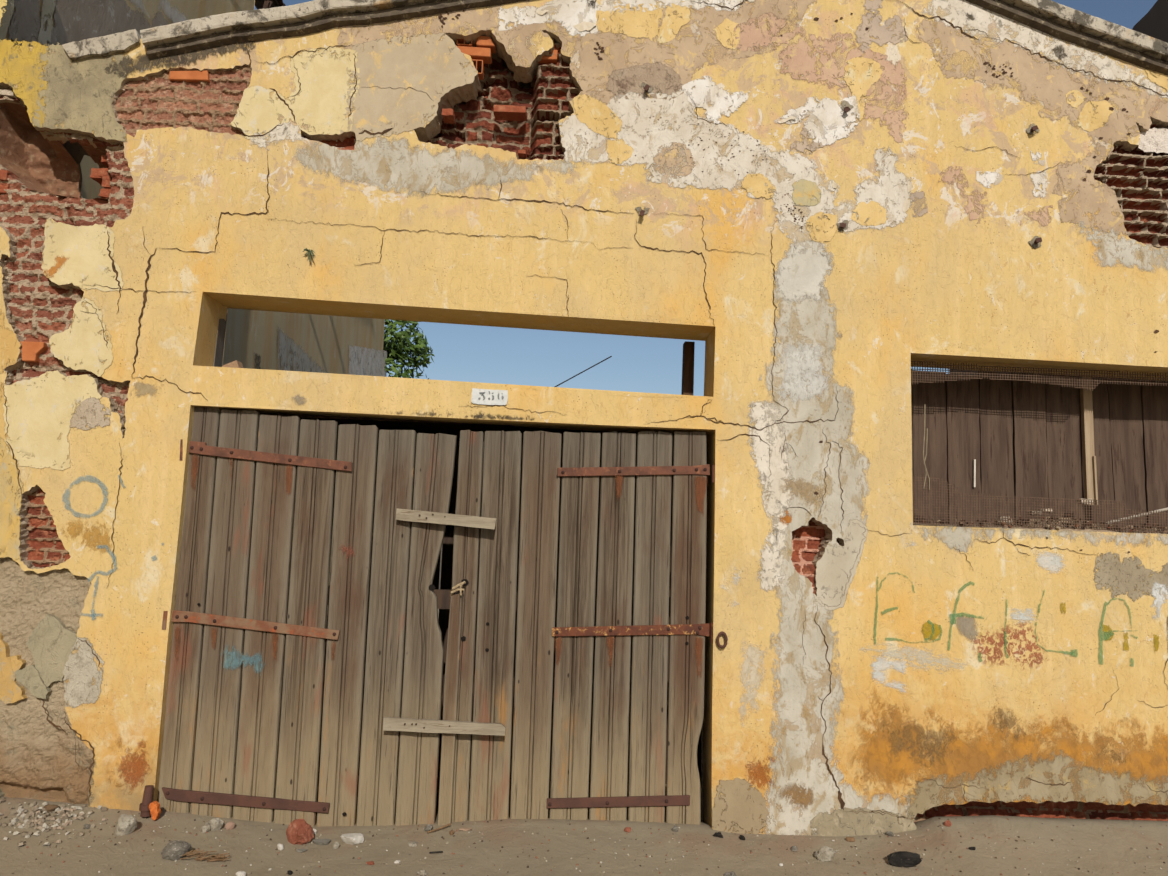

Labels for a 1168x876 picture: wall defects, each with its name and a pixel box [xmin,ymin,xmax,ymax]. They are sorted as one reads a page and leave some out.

peeling [0,0,1168,442]
flaking render [0,488,104,806]
crack [82,45,913,826]
peeling [747,401,840,595]
flaking render [906,751,1168,822]